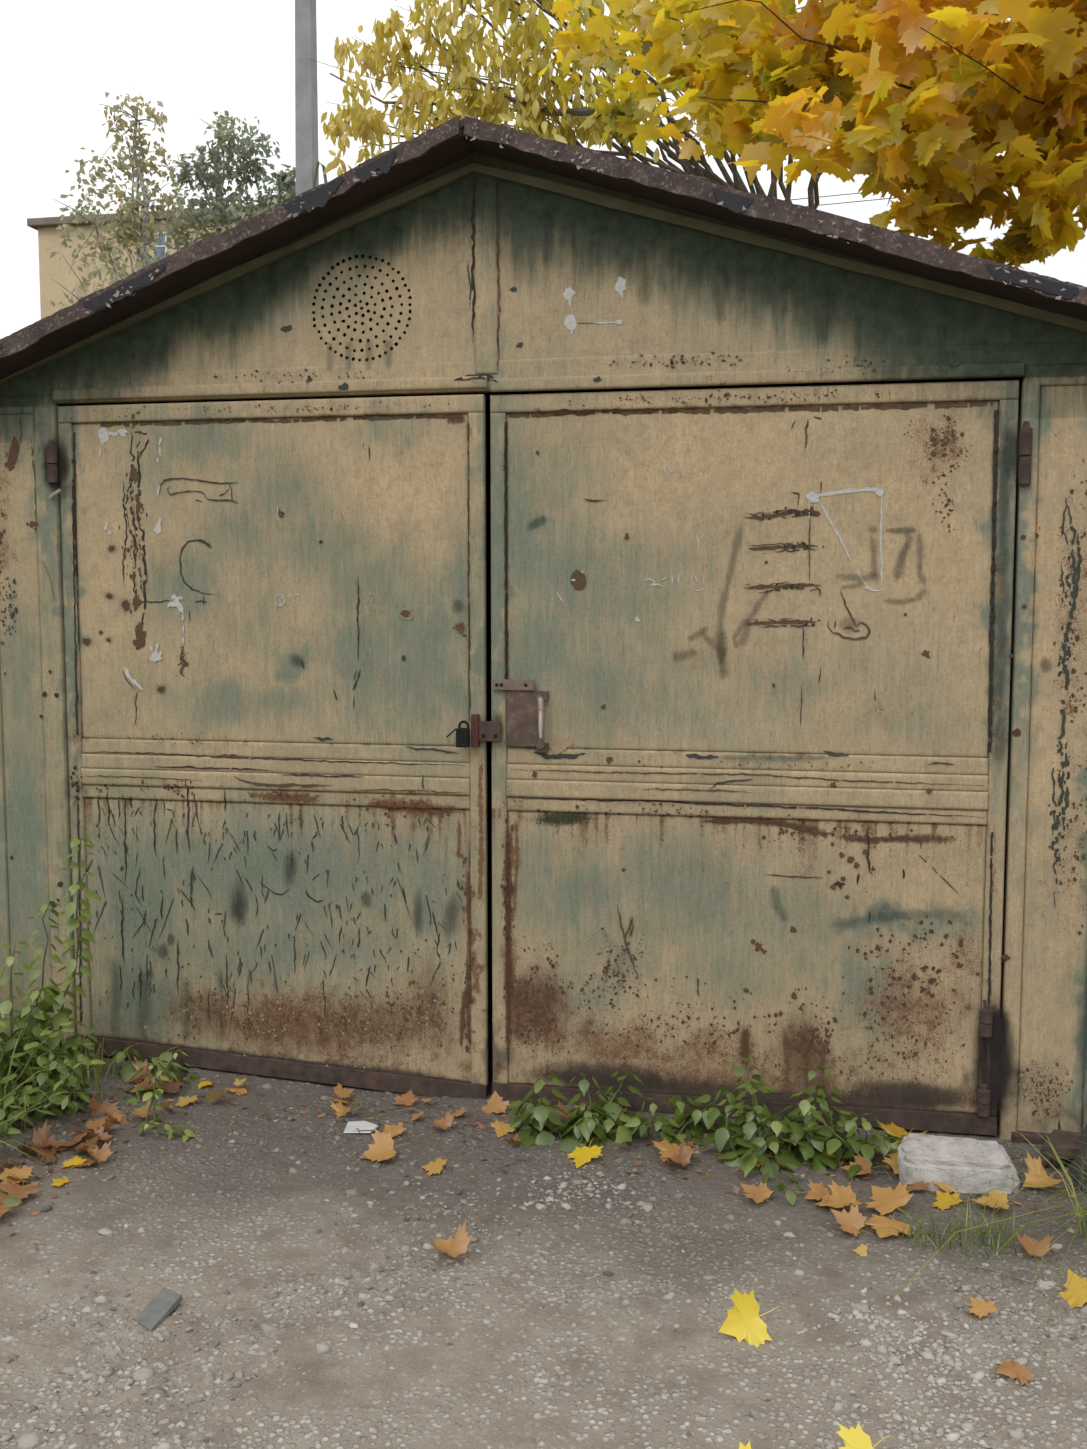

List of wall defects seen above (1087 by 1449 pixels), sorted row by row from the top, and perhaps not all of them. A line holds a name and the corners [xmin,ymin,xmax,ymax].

corrosion [4,436,19,471]
spalling [98,408,137,456]
peeling [104,437,238,662]
corrosion [609,802,954,899]
corrosion [144,765,484,1074]
corrosion [500,801,584,1058]
corrosion [741,1029,749,1067]
corrosion [768,987,838,1058]